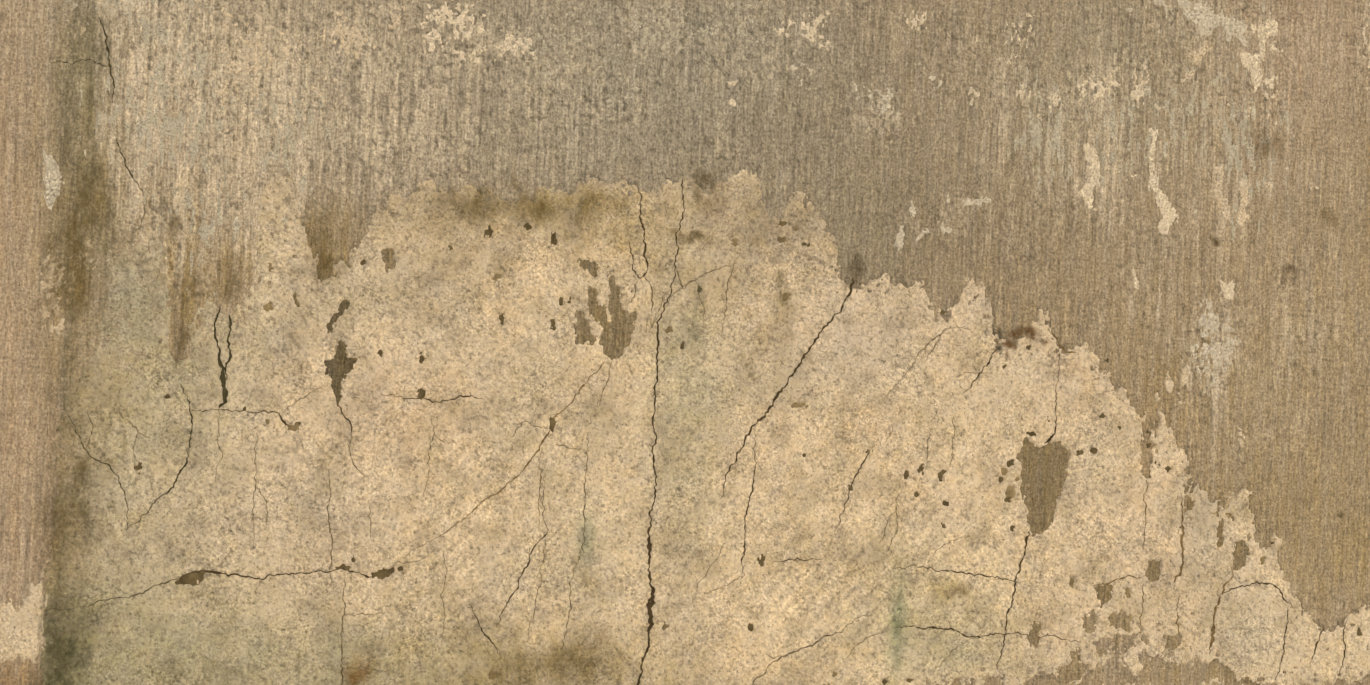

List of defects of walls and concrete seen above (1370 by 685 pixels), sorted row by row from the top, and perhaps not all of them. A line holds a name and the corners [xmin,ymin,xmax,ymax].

spalling [175,569,206,586]
crack [48,304,612,685]
spalling [324,290,357,407]
spalling [550,258,637,360]
crack [627,179,739,685]
crack [692,278,854,603]
crack [753,495,1078,683]
crack [836,327,997,529]
spalling [998,431,1098,537]
peeling [907,584,1370,685]
crack [1093,480,1347,680]
spalling [1232,540,1250,570]